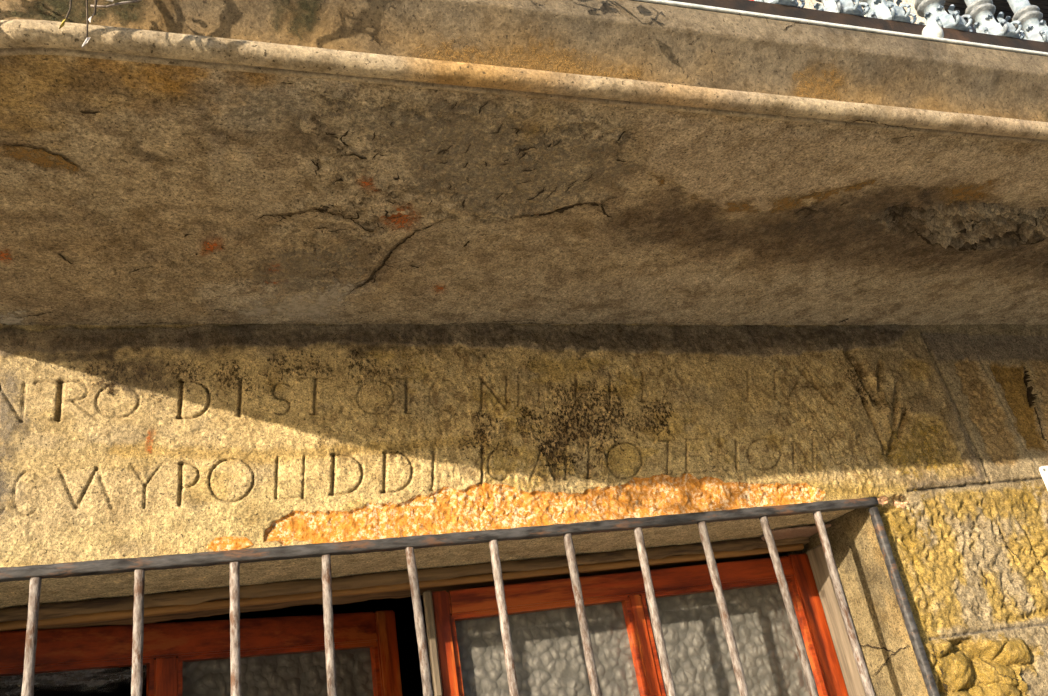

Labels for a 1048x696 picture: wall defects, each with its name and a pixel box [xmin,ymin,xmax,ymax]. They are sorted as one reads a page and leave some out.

crack [258,102,619,296]
water stain [755,179,968,270]
water stain [459,419,498,454]
water stain [538,405,606,468]
crack [1034,407,1048,443]